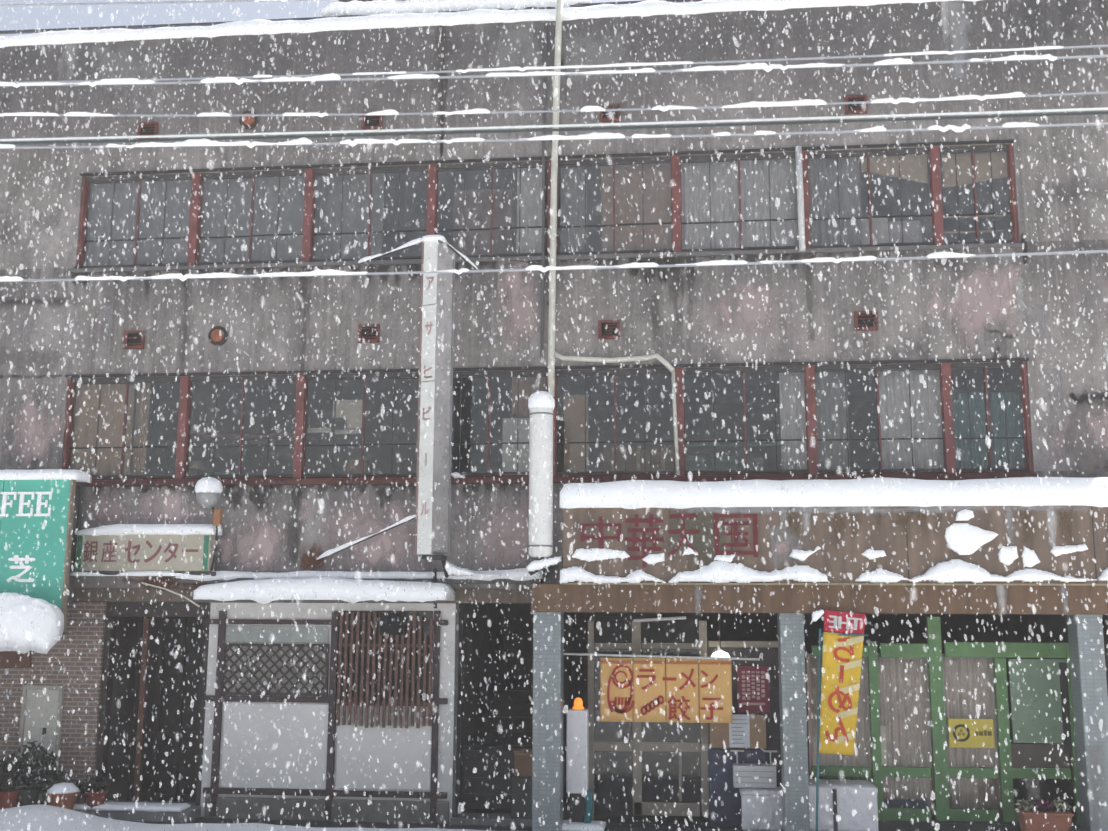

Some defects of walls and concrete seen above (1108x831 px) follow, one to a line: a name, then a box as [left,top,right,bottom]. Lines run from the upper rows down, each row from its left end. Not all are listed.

damp [941,1,970,78]